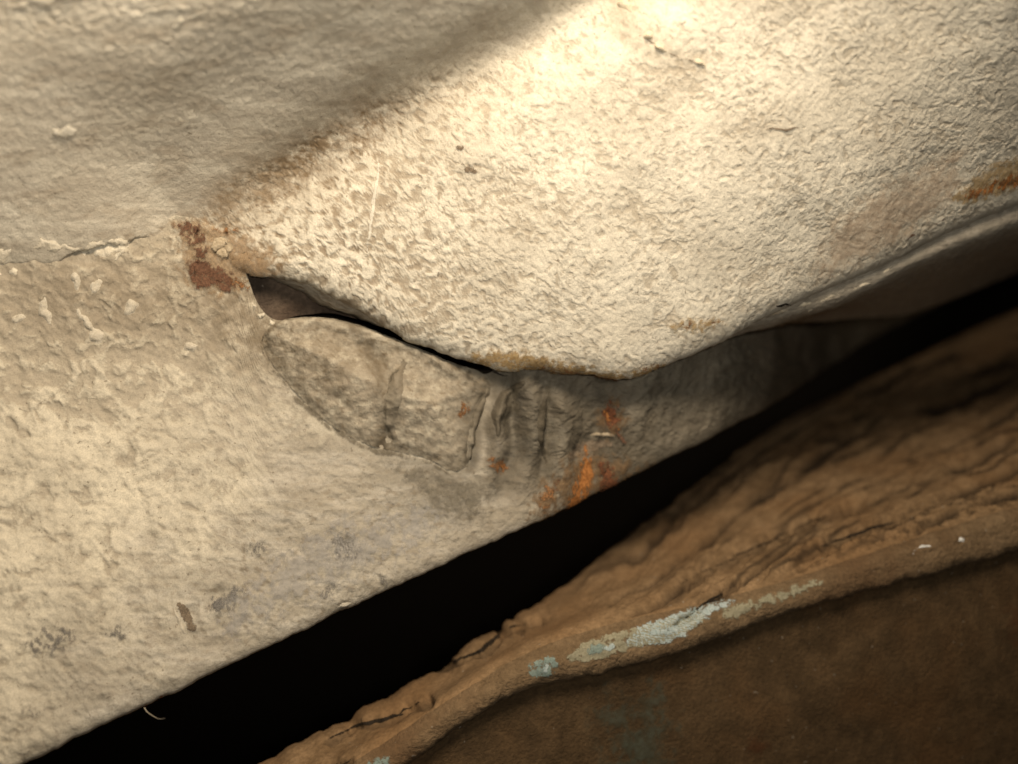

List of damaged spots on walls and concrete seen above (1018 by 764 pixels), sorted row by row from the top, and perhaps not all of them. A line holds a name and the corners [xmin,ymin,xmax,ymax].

corrosion [952,156,1018,204]
corrosion [172,220,282,297]
corrosion [530,445,649,519]
spalling [568,432,615,459]